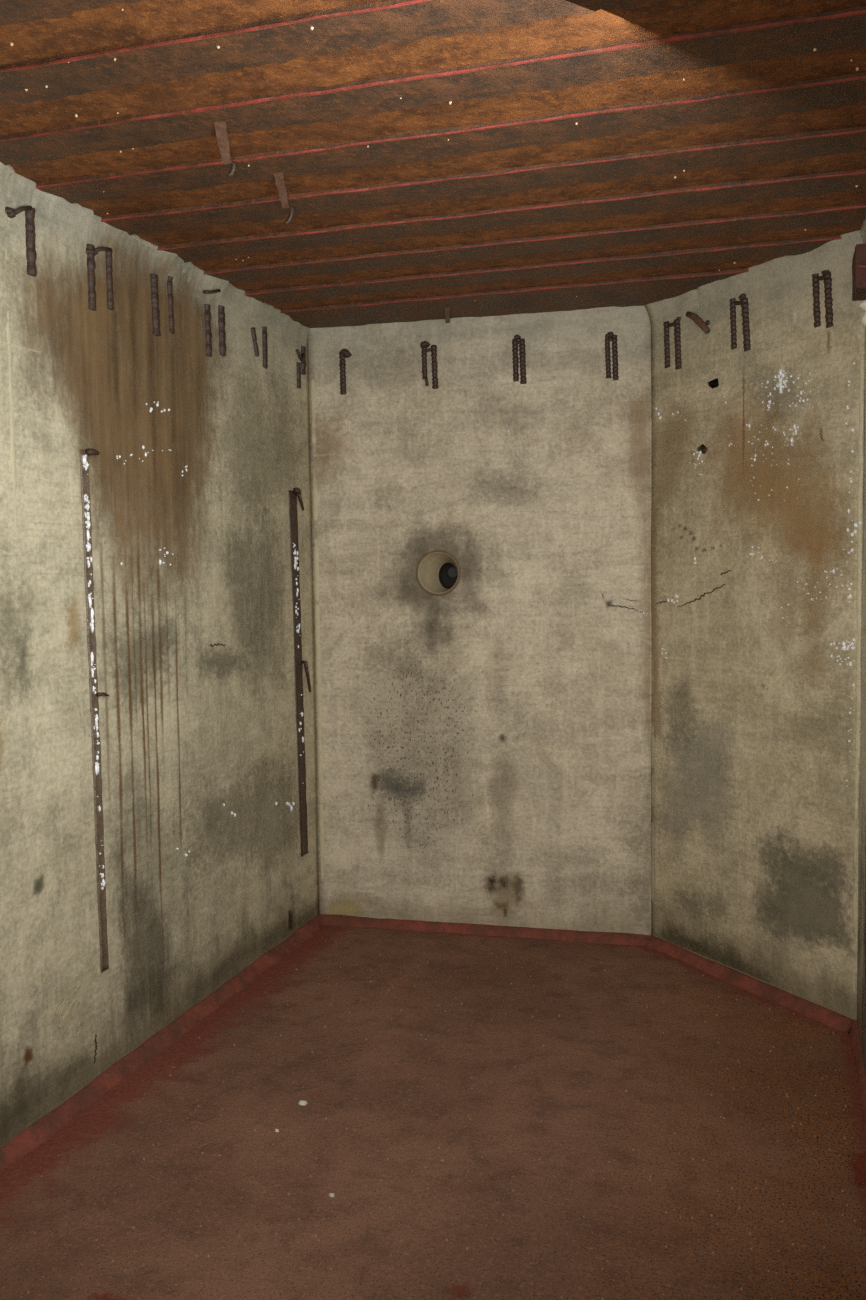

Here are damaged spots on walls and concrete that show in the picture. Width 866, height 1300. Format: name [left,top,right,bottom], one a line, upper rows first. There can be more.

leakage [761,369,811,411]
leakage [746,423,800,501]
corrosion [726,383,825,560]
corrosion [36,246,213,906]
crack [601,570,730,612]
leakage [757,835,866,970]